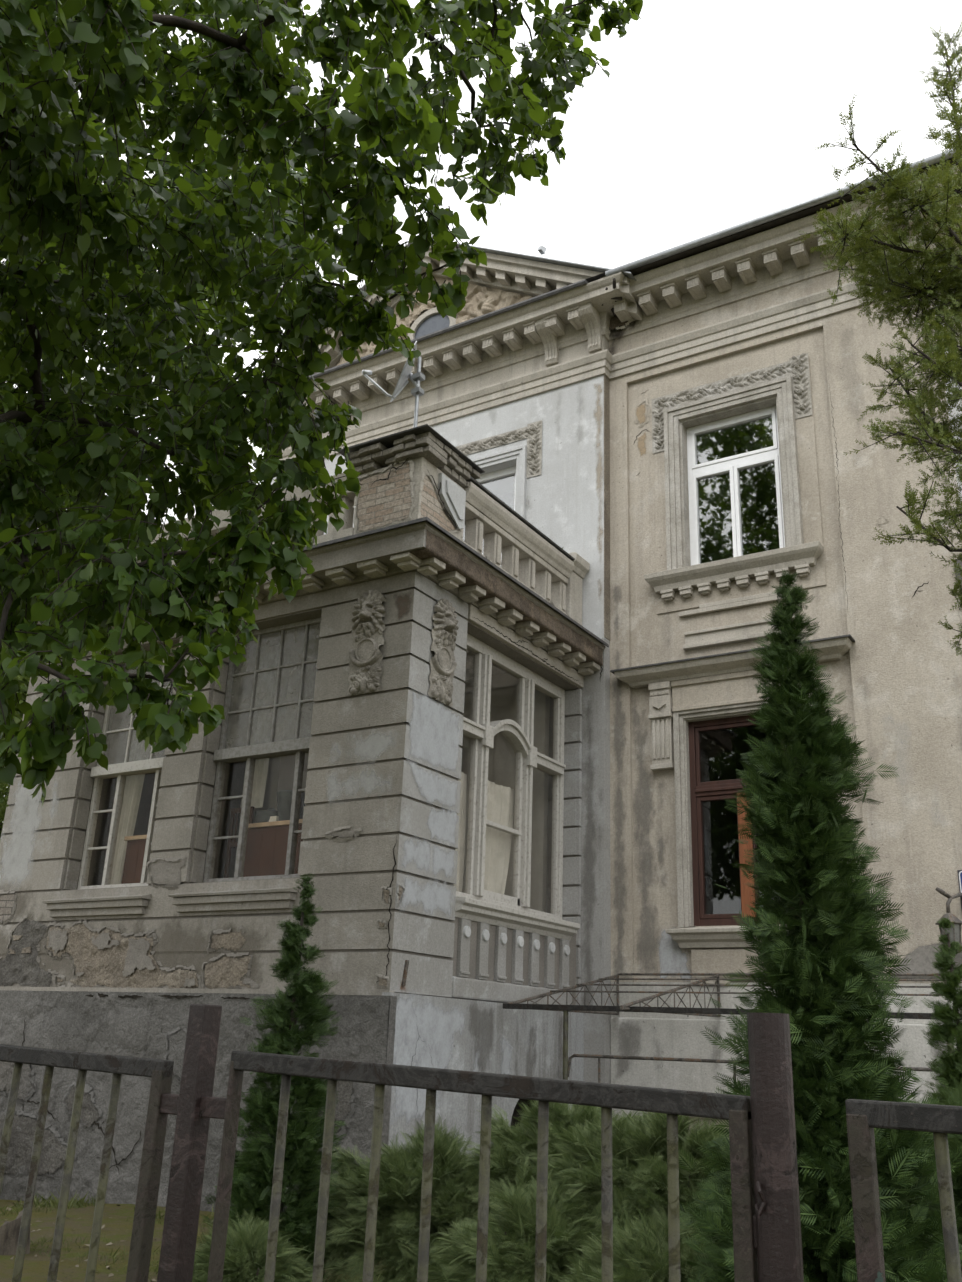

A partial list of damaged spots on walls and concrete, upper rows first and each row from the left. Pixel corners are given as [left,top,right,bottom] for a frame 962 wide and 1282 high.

spalling [353,459,603,666]
spalling [0,890,259,992]
crack [376,836,397,983]
spalling [165,1027,187,1084]